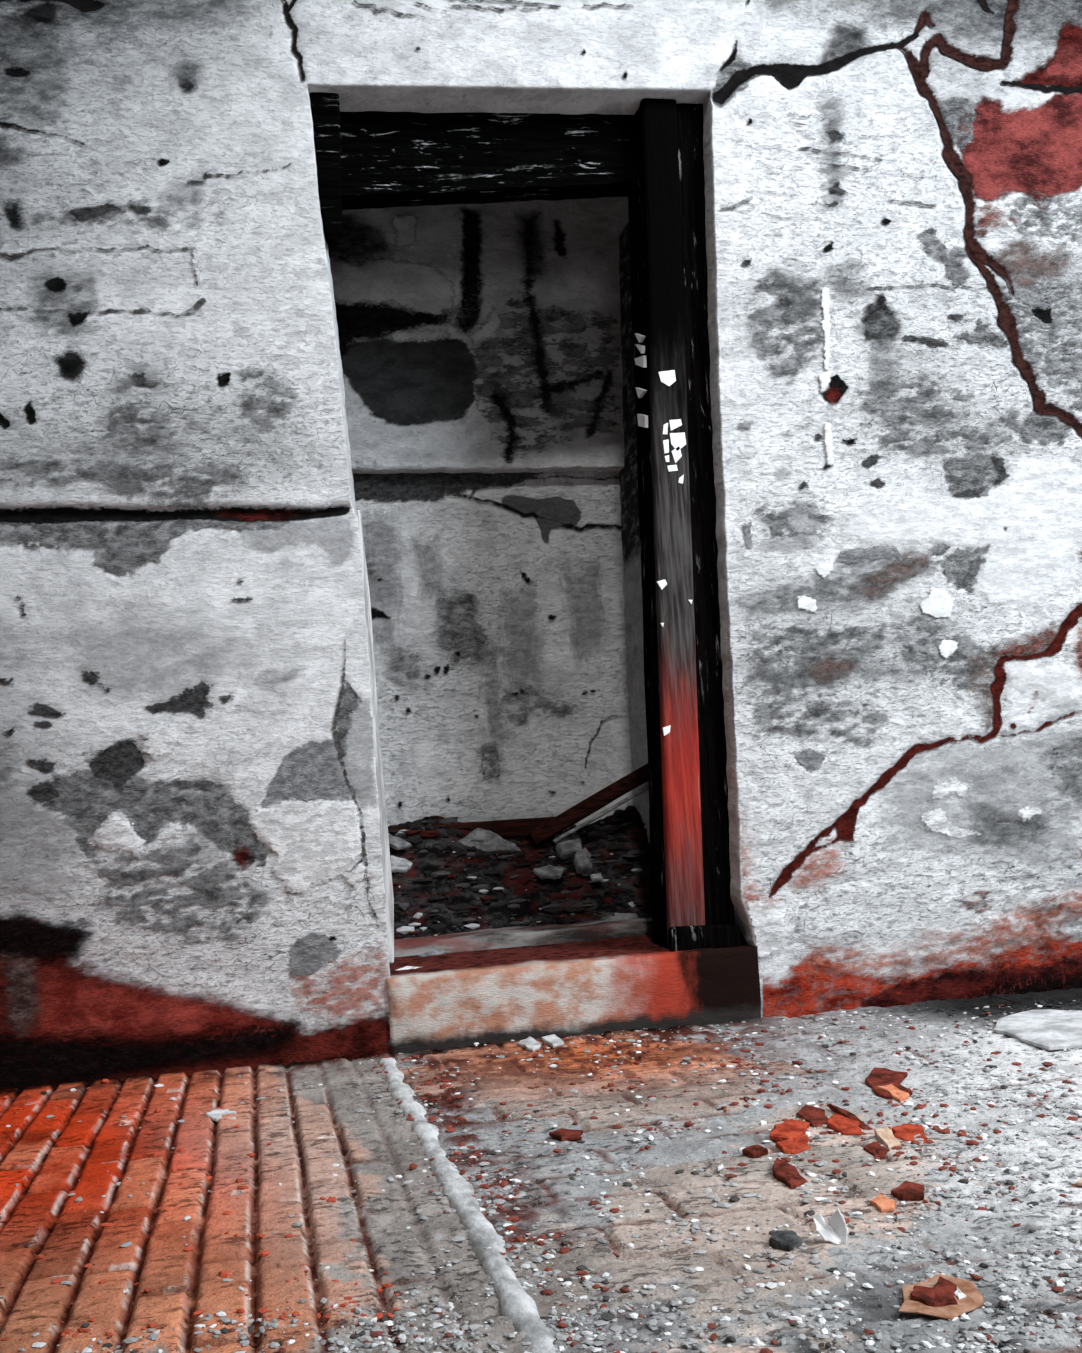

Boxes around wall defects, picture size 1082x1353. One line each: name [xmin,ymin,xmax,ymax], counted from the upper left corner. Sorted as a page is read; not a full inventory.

crack [283,0,306,81]
crack [354,0,630,17]
flaking render [931,21,1082,241]
crack [713,0,1082,436]
spalling [861,281,1082,410]
spalling [819,371,849,403]
crack [0,506,353,524]
flaking render [82,671,111,693]
spalling [26,681,376,869]
crack [585,715,622,768]
crack [769,603,1082,897]